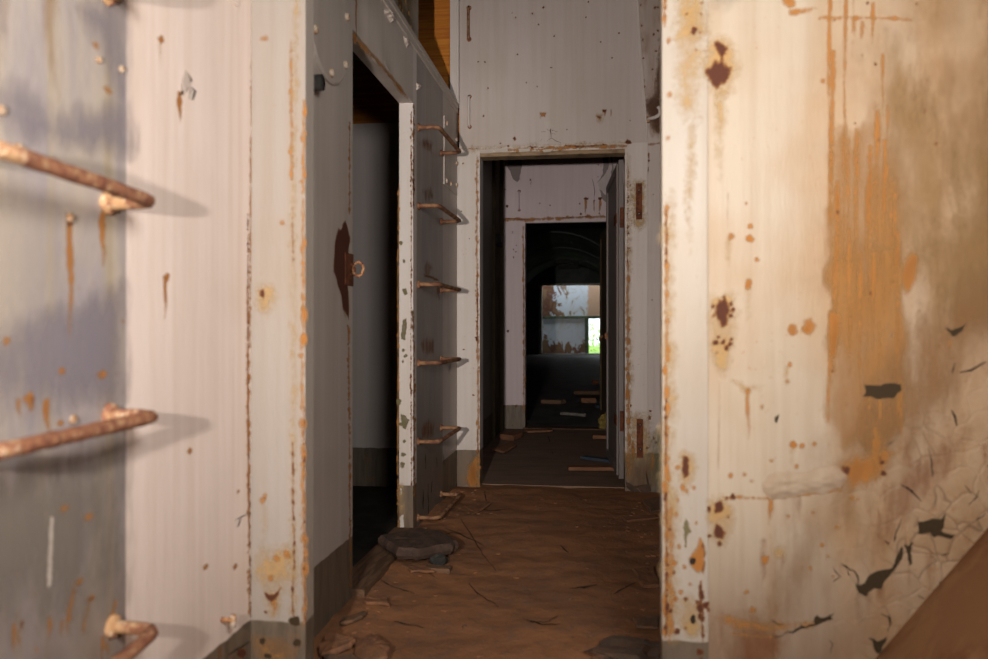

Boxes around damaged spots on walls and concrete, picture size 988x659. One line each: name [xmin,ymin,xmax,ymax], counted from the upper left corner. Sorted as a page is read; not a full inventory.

corrosion [667,0,704,43]
corrosion [681,40,734,110]
corrosion [66,213,74,332]
corrosion [281,51,307,368]
corrosion [782,0,983,500]
corrosion [234,137,308,621]
corrosion [625,171,736,659]
spalling [863,383,902,419]
crack [952,362,986,374]
crack [902,450,933,501]
spalling [841,514,955,597]